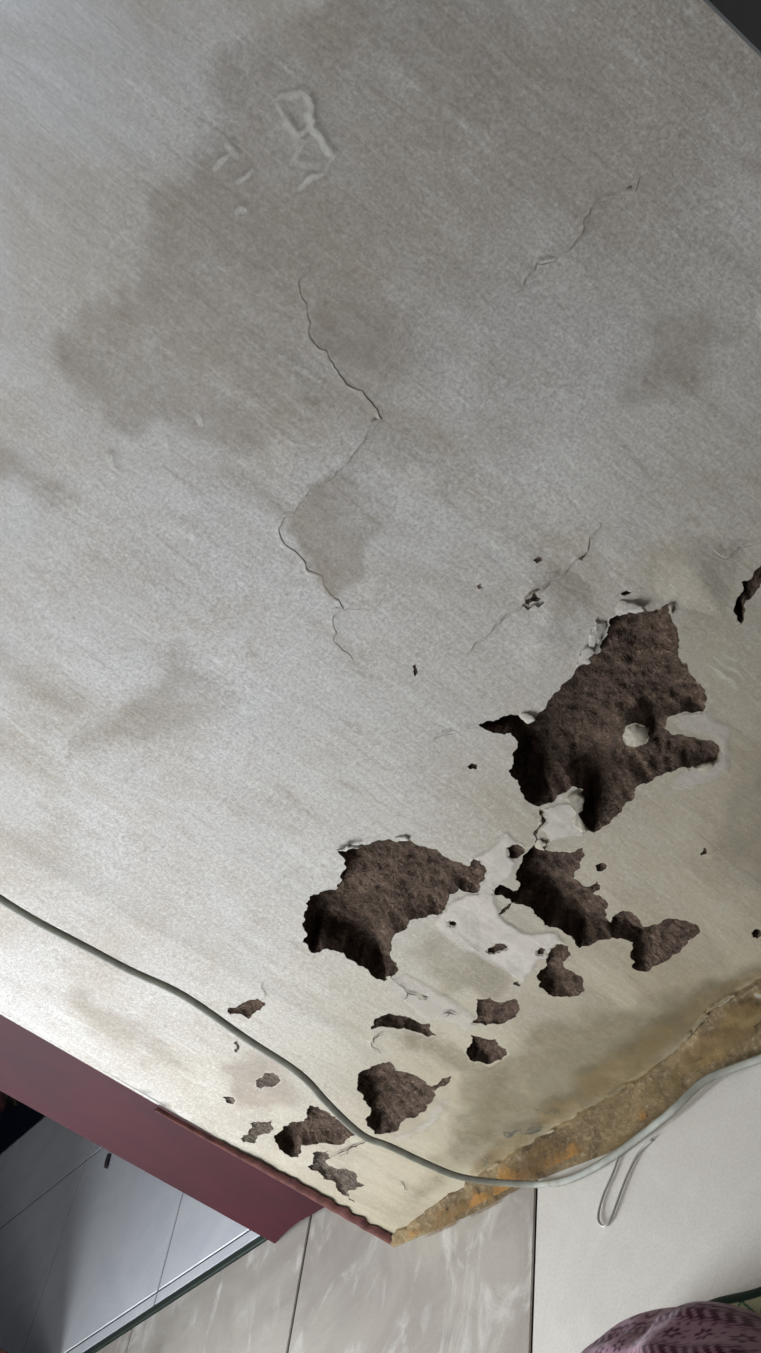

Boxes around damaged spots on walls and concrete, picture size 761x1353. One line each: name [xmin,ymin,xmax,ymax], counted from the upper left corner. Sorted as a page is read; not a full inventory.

crack [273,263,447,663]
crack [453,522,602,660]
spalling [733,566,761,624]
spalling [302,591,726,1064]
spalling [241,1062,451,1202]
corrosion [411,1142,579,1237]